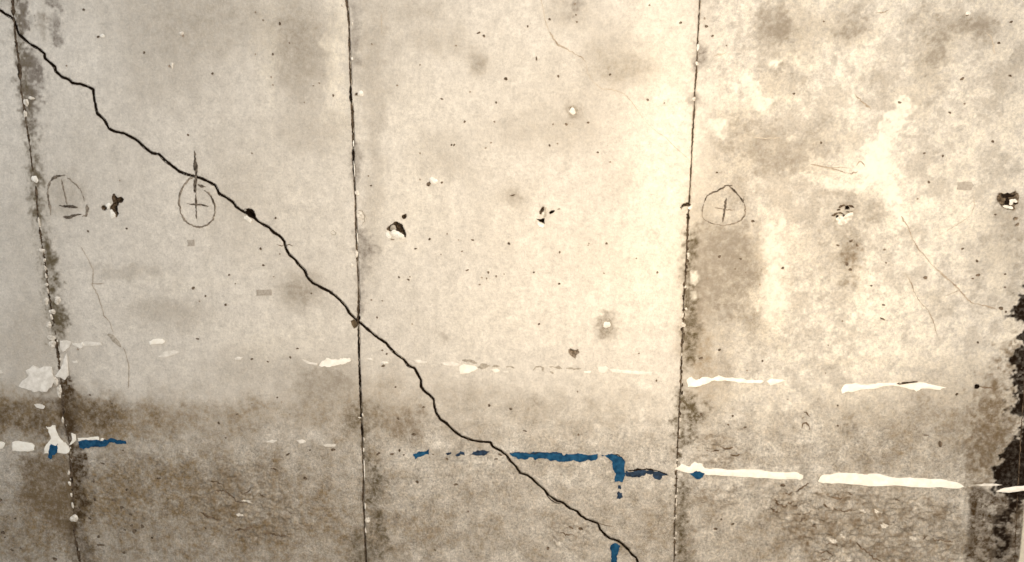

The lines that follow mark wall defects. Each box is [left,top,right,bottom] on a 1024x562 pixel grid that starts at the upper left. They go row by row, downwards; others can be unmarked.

crack [541,0,687,158]
hole [101,194,124,219]
hole [386,214,407,240]
hole [536,207,554,228]
spalling [832,204,868,292]
hole [997,191,1019,226]
crack [0,10,639,562]
peeling [19,340,102,409]
damp [285,359,366,412]
damp [0,365,141,542]
damp [961,281,1024,562]